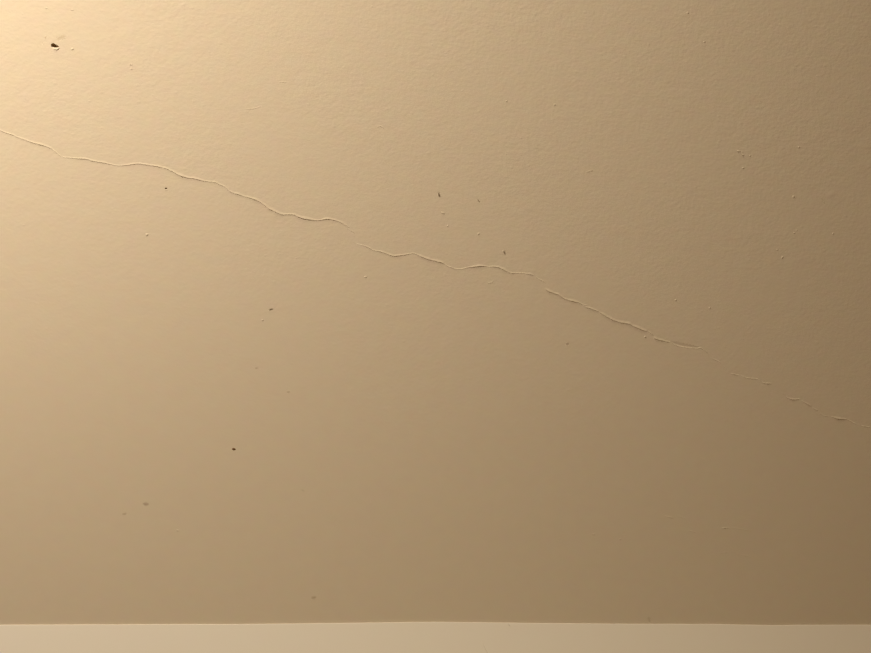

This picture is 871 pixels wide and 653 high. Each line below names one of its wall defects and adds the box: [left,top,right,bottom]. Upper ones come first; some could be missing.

crack [0,129,870,427]